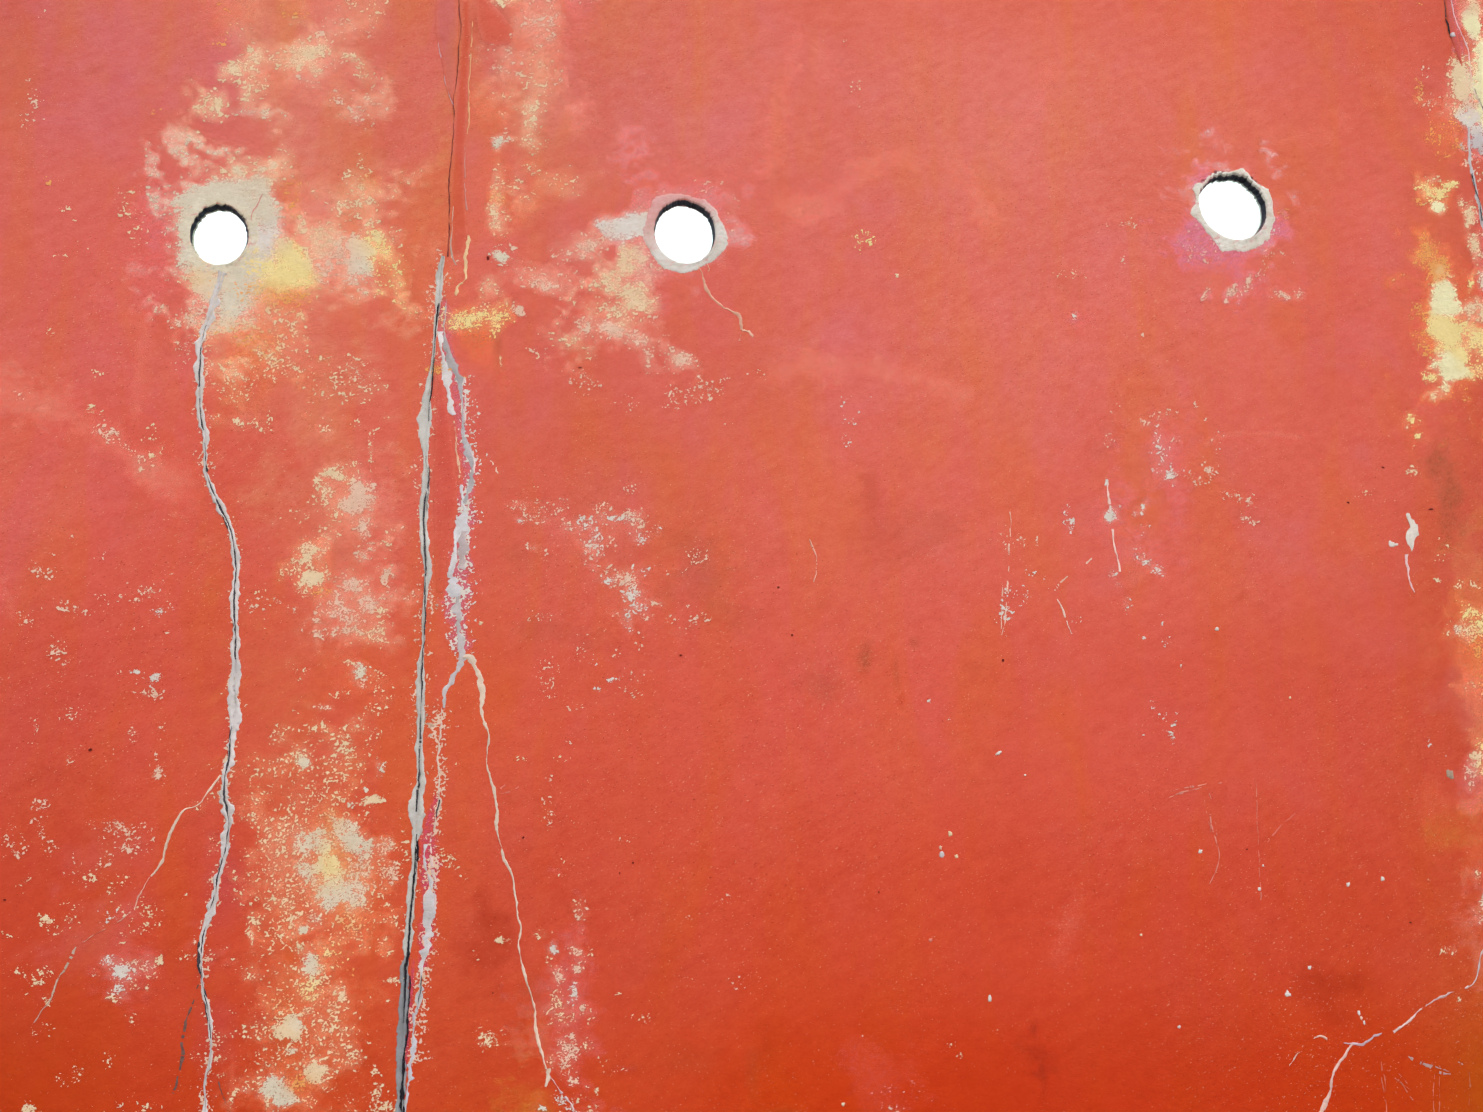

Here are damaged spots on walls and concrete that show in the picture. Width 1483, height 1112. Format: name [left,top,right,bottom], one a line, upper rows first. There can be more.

peeling [433,0,766,409]
peeling [1387,0,1483,402]
crack [1444,0,1483,267]
crack [34,270,246,1112]
peeling [117,0,422,1112]
crack [392,4,574,1112]
peeling [507,484,711,698]
peeling [1433,538,1483,699]
peeling [1446,738,1483,813]
peeling [476,1027,506,1052]
peeling [535,929,627,1112]
crack [1289,950,1483,1112]